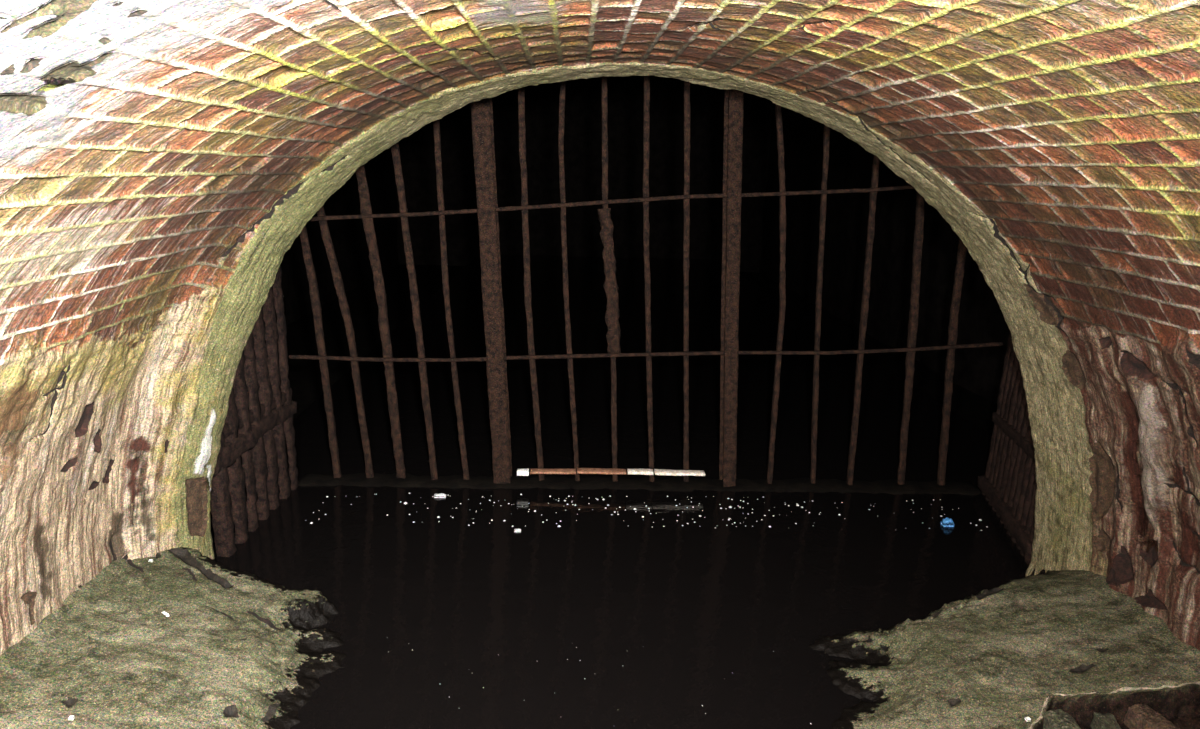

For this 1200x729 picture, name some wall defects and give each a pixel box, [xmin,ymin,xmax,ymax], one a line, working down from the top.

peeling [0,0,97,39]
peeling [114,2,148,17]
peeling [0,37,113,116]
spalling [1062,350,1087,390]
spalling [1099,334,1156,380]
leakage [108,512,124,560]
leakage [140,499,155,540]
spalling [1089,442,1158,587]
leakage [34,525,52,600]
spalling [1135,589,1167,610]